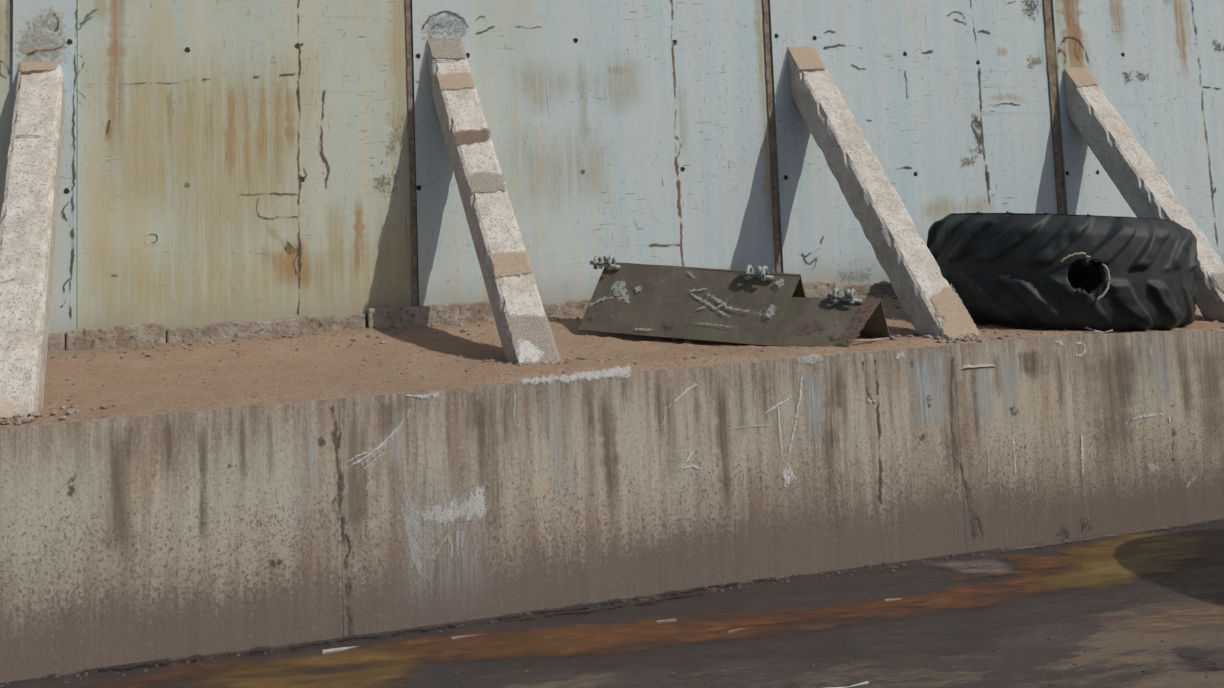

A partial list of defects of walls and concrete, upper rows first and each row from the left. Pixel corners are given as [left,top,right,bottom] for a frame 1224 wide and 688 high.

rust [1063,2,1083,70]
damp [348,411,410,523]
damp [589,405,616,488]
damp [719,376,820,494]
crack [950,358,984,536]
damp [401,493,465,579]
crack [249,406,796,653]
crack [84,654,215,671]
rust [209,534,1202,688]